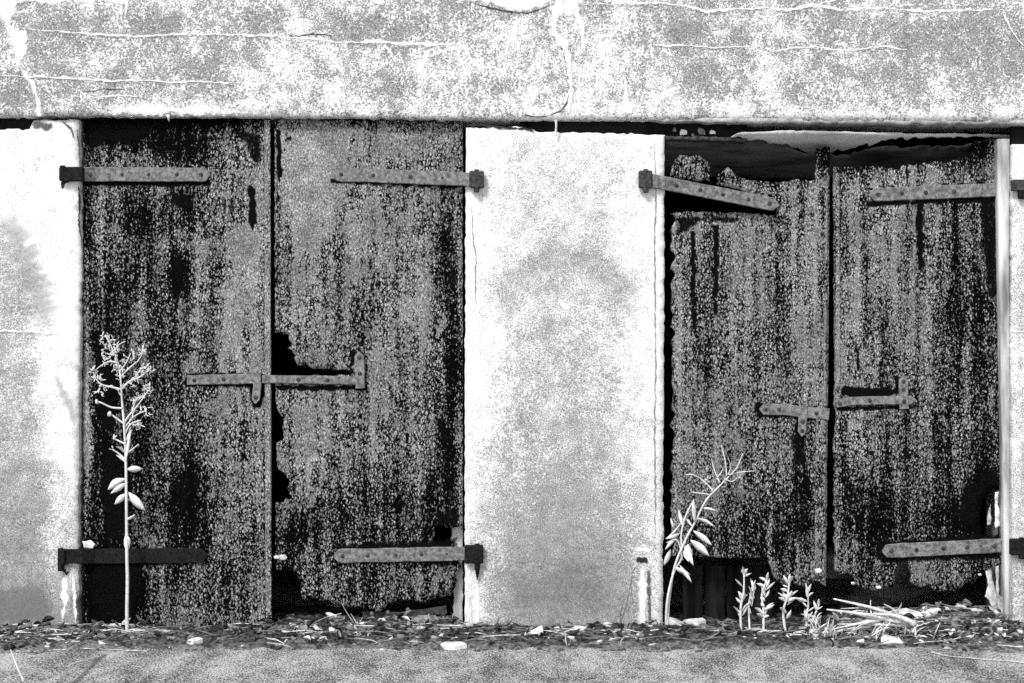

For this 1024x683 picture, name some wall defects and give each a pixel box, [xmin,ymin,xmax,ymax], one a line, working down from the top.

crack [31,29,459,55]
crack [1,75,250,98]
rust [83,180,211,211]
rust [247,184,257,230]
rust [866,185,997,298]
rust [675,215,739,329]
rust [183,371,265,408]
rust [278,349,367,391]
rust [836,376,917,411]
rust [94,338,157,549]
rust [876,467,1000,563]
rust [89,563,175,623]